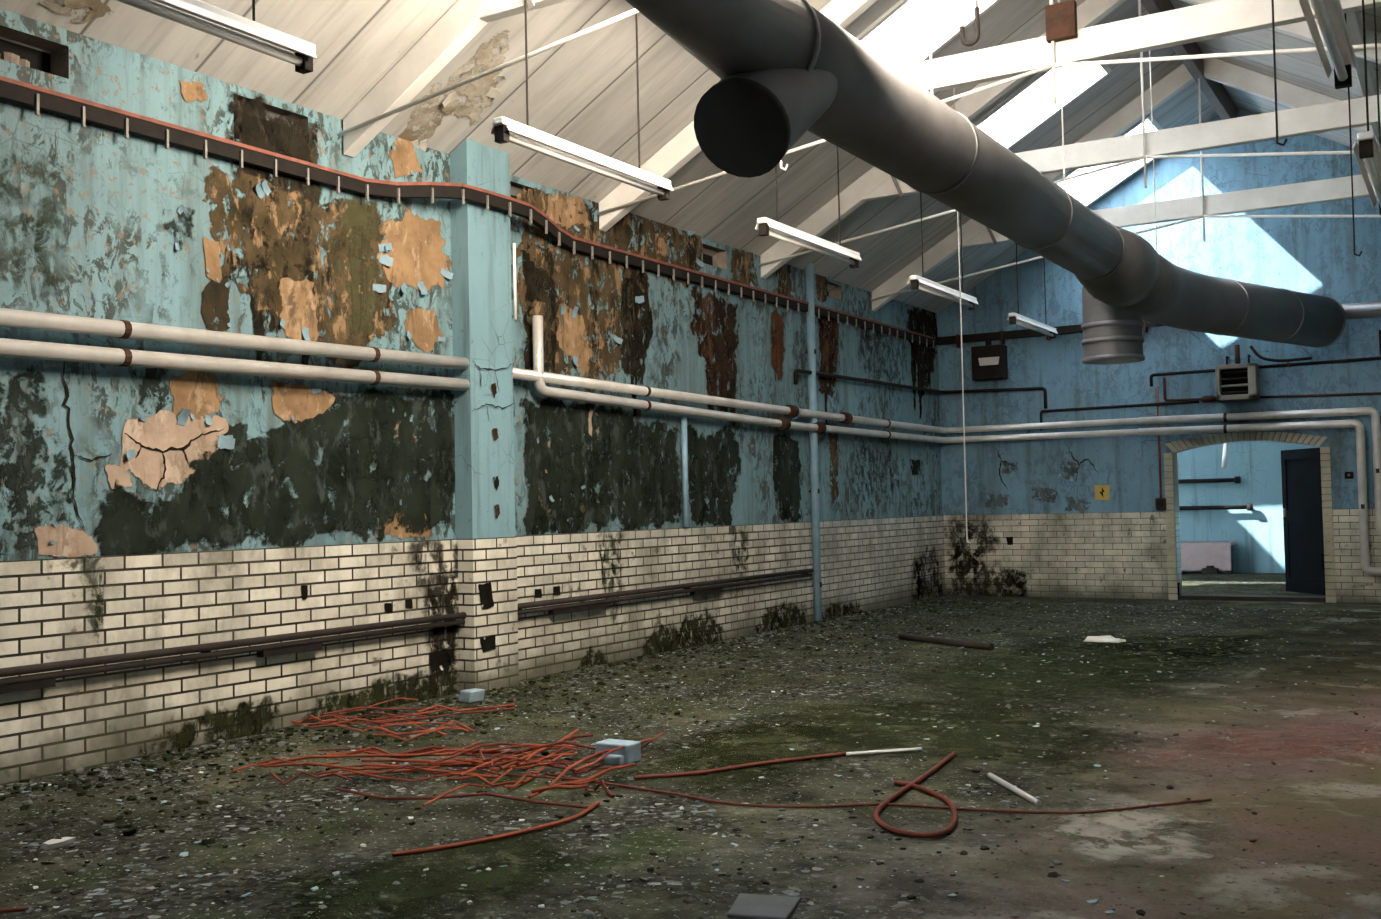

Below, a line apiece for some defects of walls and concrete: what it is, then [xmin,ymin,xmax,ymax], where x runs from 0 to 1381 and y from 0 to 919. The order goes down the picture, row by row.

leakage [0,155,65,301]
spalling [105,370,235,490]
leakage [78,387,459,698]
spalling [272,379,335,423]
peeling [163,165,453,369]
peeling [516,185,704,443]
leakage [519,264,749,619]